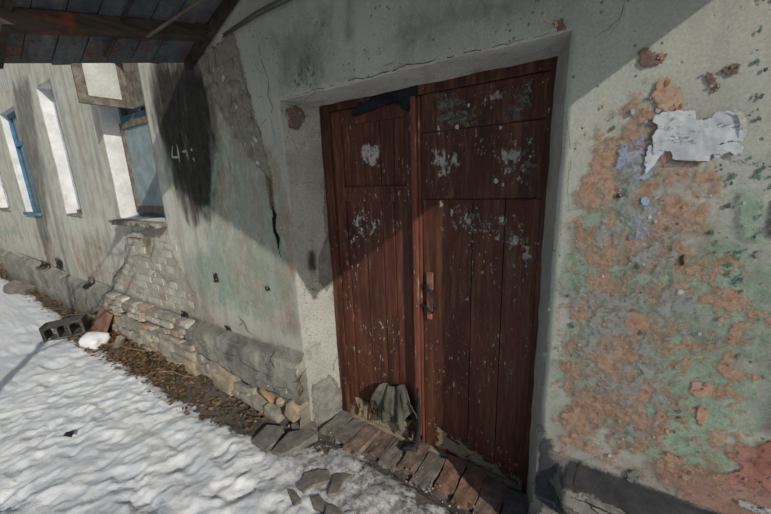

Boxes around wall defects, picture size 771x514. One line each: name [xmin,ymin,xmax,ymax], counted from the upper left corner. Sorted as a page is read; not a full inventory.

spalling [72,237,111,290]
flaking render [104,228,211,357]
leakage [158,72,210,204]
spalling [197,34,293,319]
crack [269,181,281,256]
peeling [528,77,771,514]
peeling [434,424,522,486]
crack [571,460,612,514]